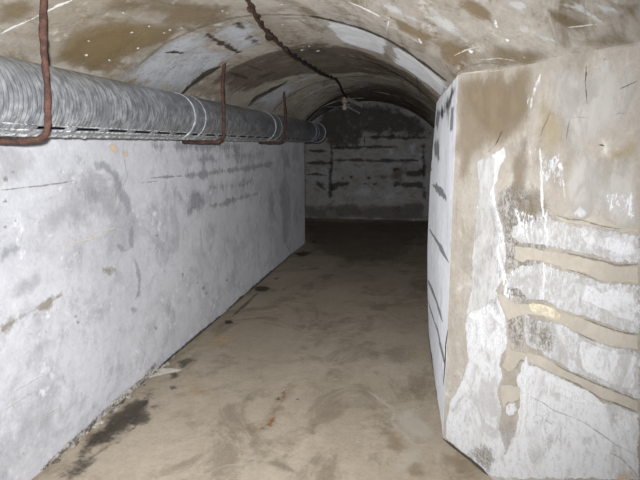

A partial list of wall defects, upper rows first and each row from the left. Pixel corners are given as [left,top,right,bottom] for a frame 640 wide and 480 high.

leakage [5,3,26,18]
leakage [61,6,228,68]
leakage [207,33,242,53]
leakage [0,44,454,186]
leakage [462,74,541,147]
peeling [446,147,640,480]
spalling [40,360,170,471]
leakage [81,400,149,453]